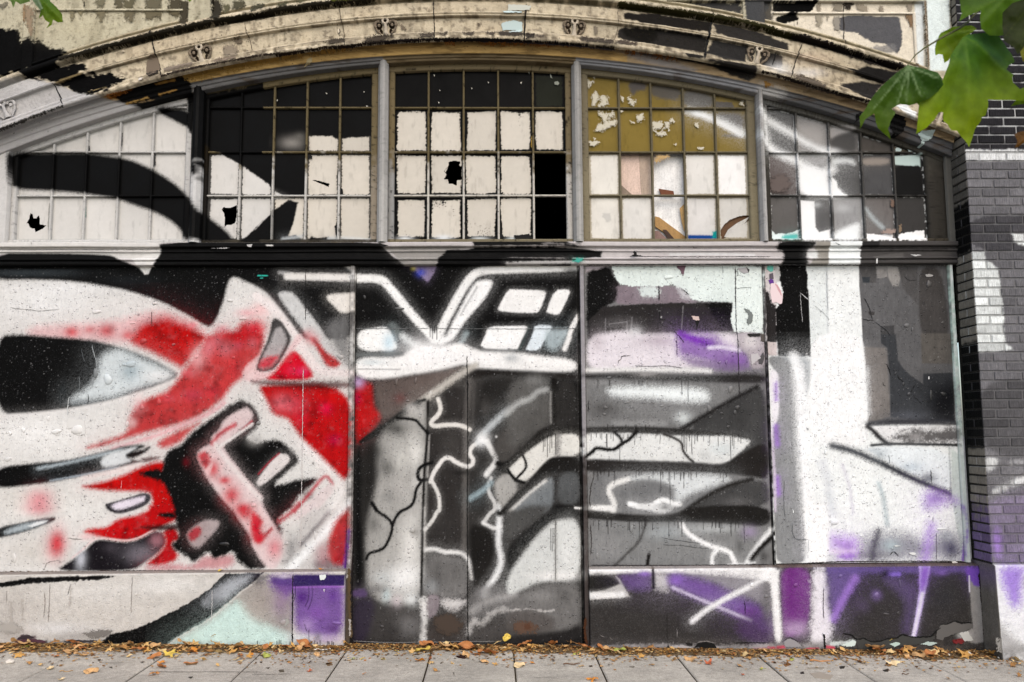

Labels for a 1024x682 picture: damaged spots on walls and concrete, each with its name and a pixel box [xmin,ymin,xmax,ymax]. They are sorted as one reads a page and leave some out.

spalling [138,53,160,80]
peeling [587,77,676,146]
crack [356,357,495,643]